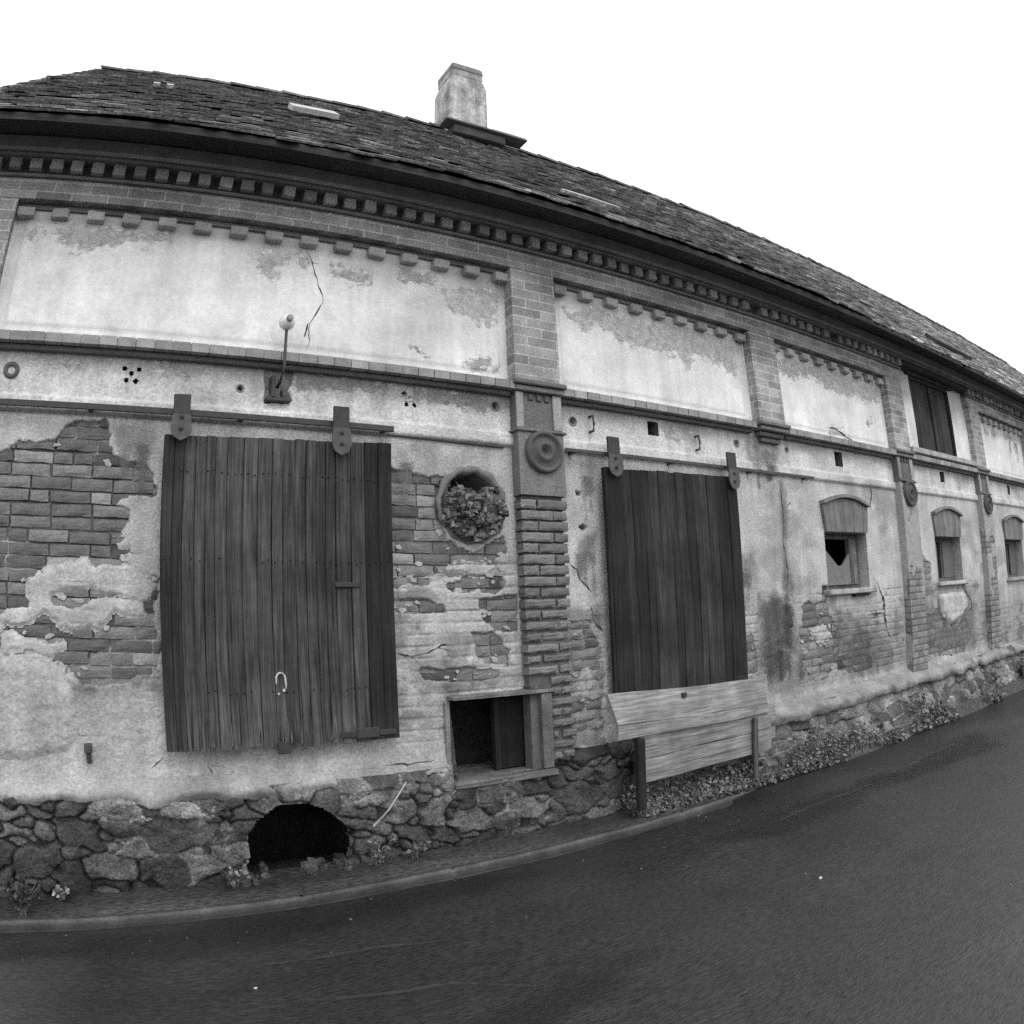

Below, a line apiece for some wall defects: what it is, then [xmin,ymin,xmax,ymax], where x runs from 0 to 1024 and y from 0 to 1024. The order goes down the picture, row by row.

crack [304,252,323,349]
spalling [0,419,161,687]
spalling [391,470,517,683]
crack [571,565,603,631]
water stain [759,593,796,678]
spalling [798,586,873,681]
crack [869,581,892,639]
spalling [923,557,931,585]
spalling [926,610,971,657]